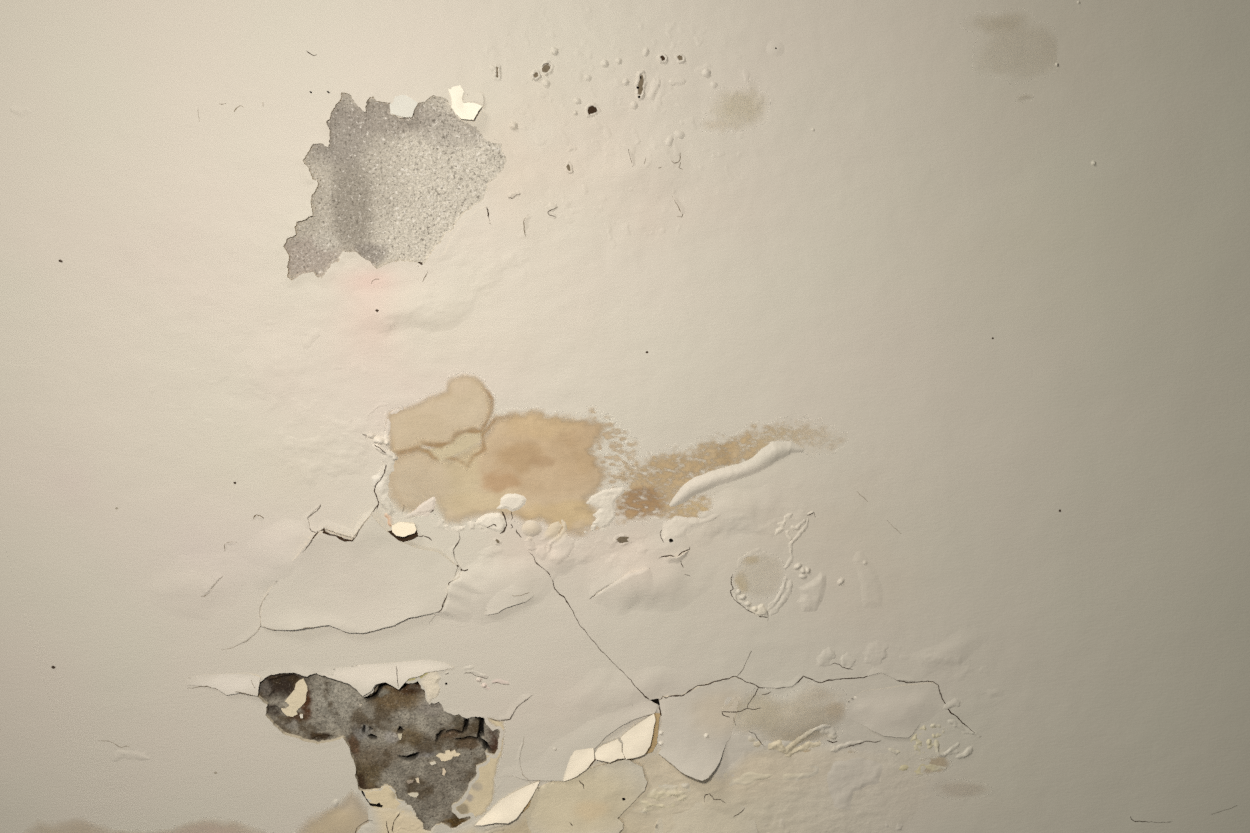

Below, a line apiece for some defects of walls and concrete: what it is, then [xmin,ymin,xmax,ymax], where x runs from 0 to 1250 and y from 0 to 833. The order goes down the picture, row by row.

flaking render [274,83,515,291]
crack [200,515,264,597]
crack [301,466,386,551]
leakage [388,376,786,535]
crack [429,530,972,731]
peeling [186,659,750,833]
crack [488,693,532,784]